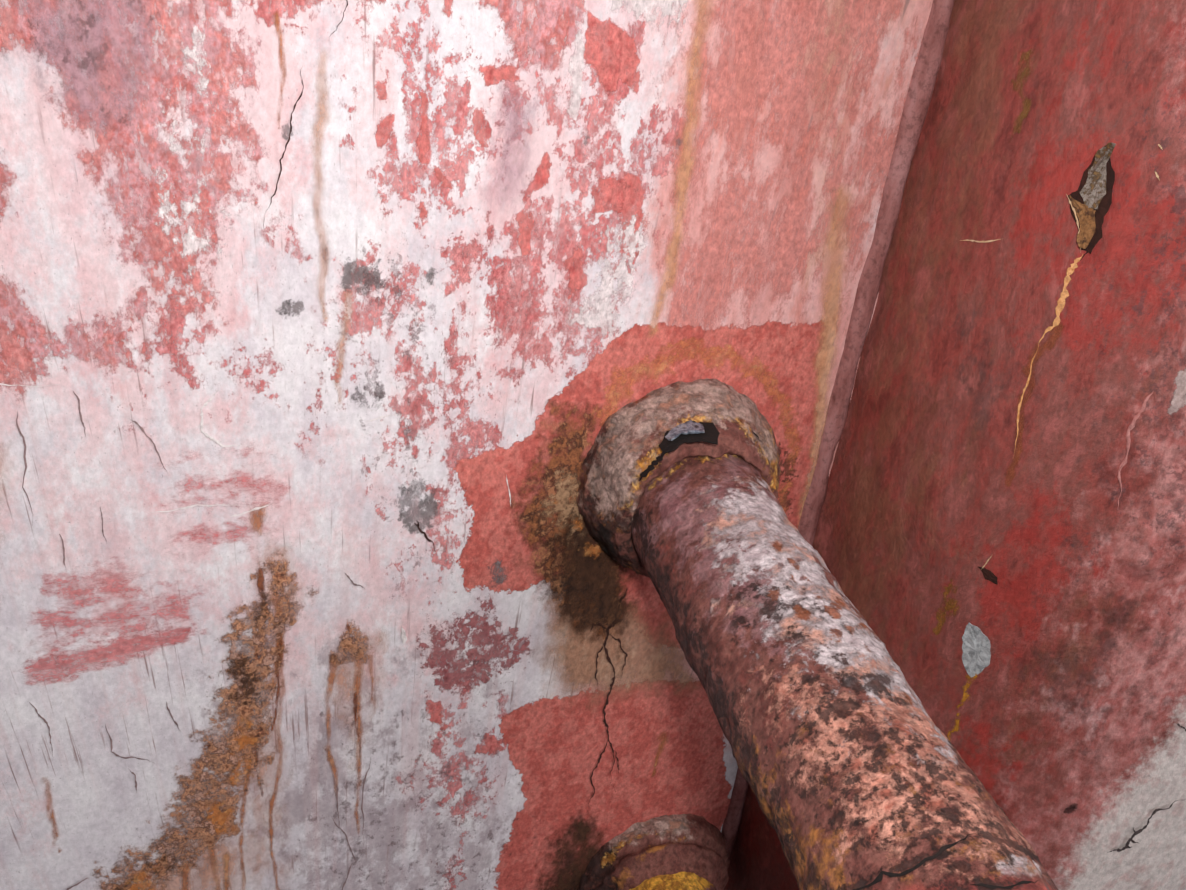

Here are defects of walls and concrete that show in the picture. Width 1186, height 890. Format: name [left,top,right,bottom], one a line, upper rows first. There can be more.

peeling [0,0,335,399]
peeling [1066,142,1116,261]
peeling [183,523,248,544]
peeling [184,476,271,500]
corrosion [511,403,631,639]
peeling [296,0,925,890]
peeling [1168,369,1186,414]
peeling [25,576,191,682]
corrosion [94,553,317,890]
corrosion [328,621,373,774]
crack [588,588,628,806]
peeling [962,623,991,677]